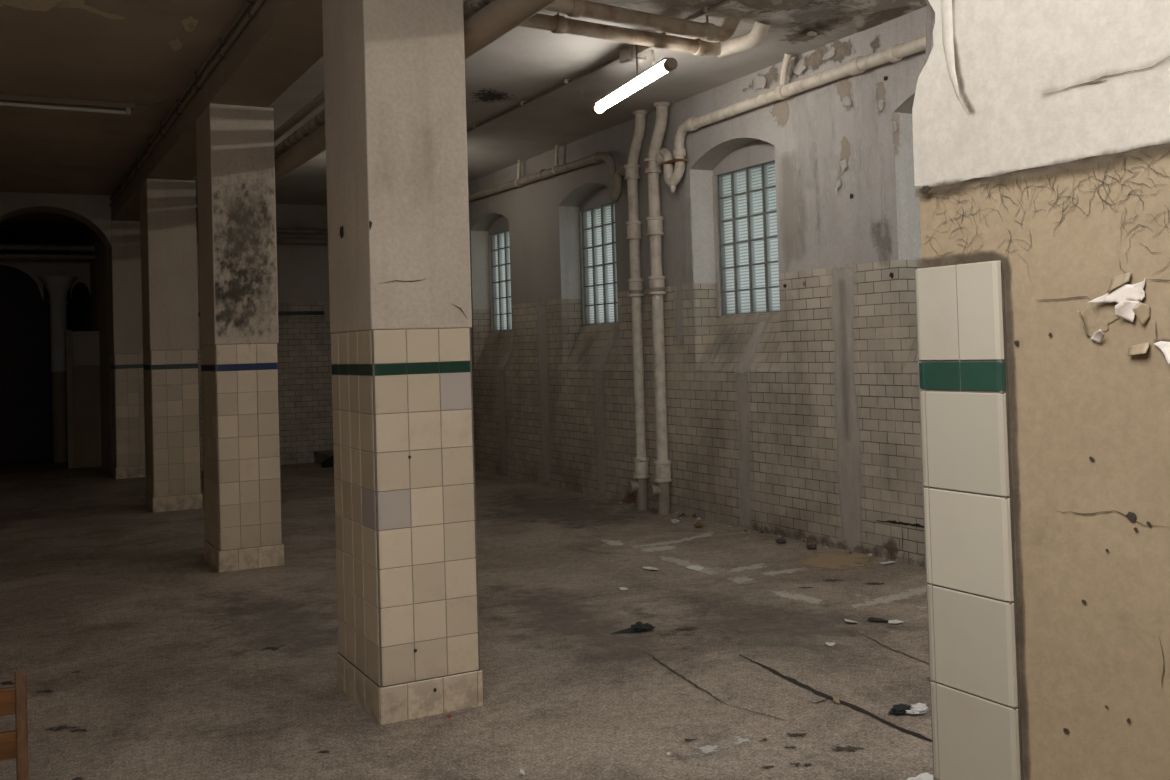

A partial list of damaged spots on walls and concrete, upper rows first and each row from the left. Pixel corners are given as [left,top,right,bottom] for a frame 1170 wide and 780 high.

flaking render [732,0,864,92]
crack [1047,56,1170,94]
crack [917,151,1170,273]
water stain [214,185,271,336]
peeling [1042,272,1170,365]
crack [876,520,924,551]
crack [1058,510,1163,527]
crack [642,650,932,742]